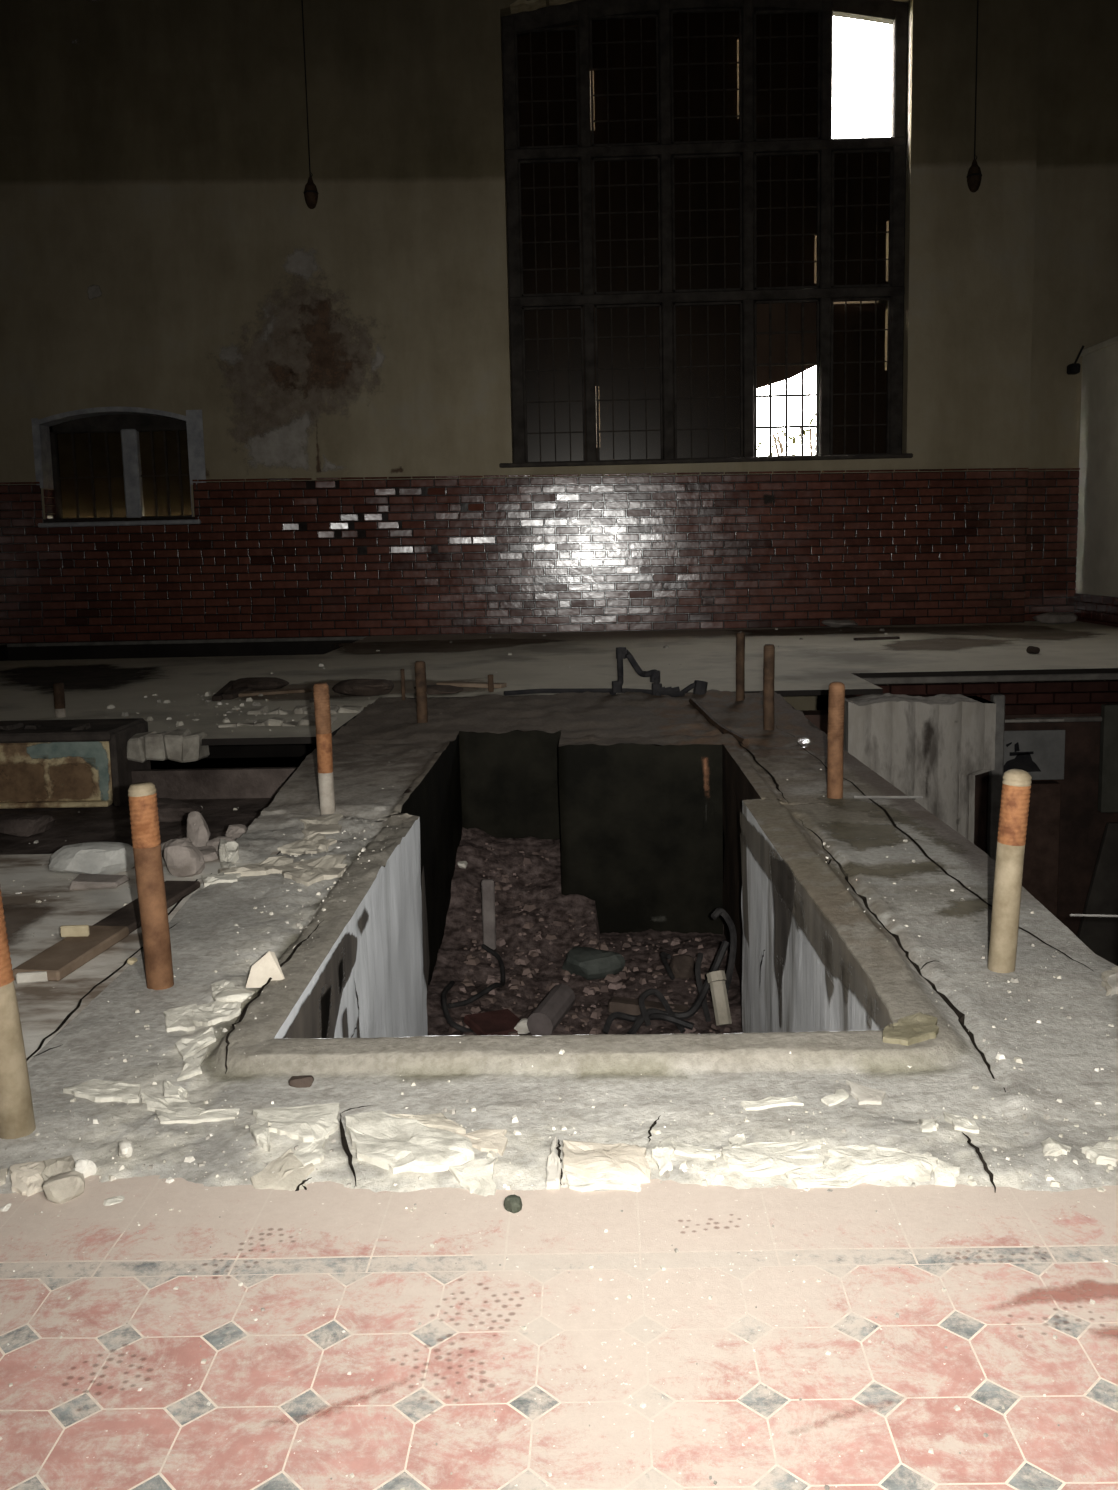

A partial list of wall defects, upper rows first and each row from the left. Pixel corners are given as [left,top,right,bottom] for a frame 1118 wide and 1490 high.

damp [220,249,384,472]
crack [730,733,1006,1092]
crack [774,722,1093,971]
crack [225,920,324,1074]
spalling [0,1155,97,1196]
spalling [103,1195,125,1206]
spalling [63,980,508,1197]
crack [295,1177,312,1191]
crack [340,1105,371,1185]
crack [962,1132,996,1193]